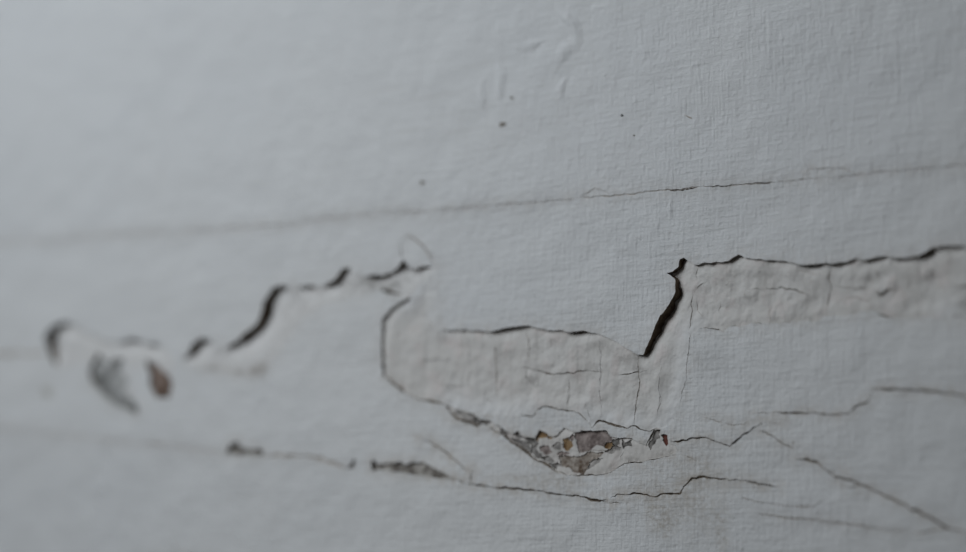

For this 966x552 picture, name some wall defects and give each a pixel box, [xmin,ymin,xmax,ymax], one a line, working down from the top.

crack [0,164,966,261]
peeling [44,246,966,476]
spalling [371,460,453,479]
crack [422,388,966,534]